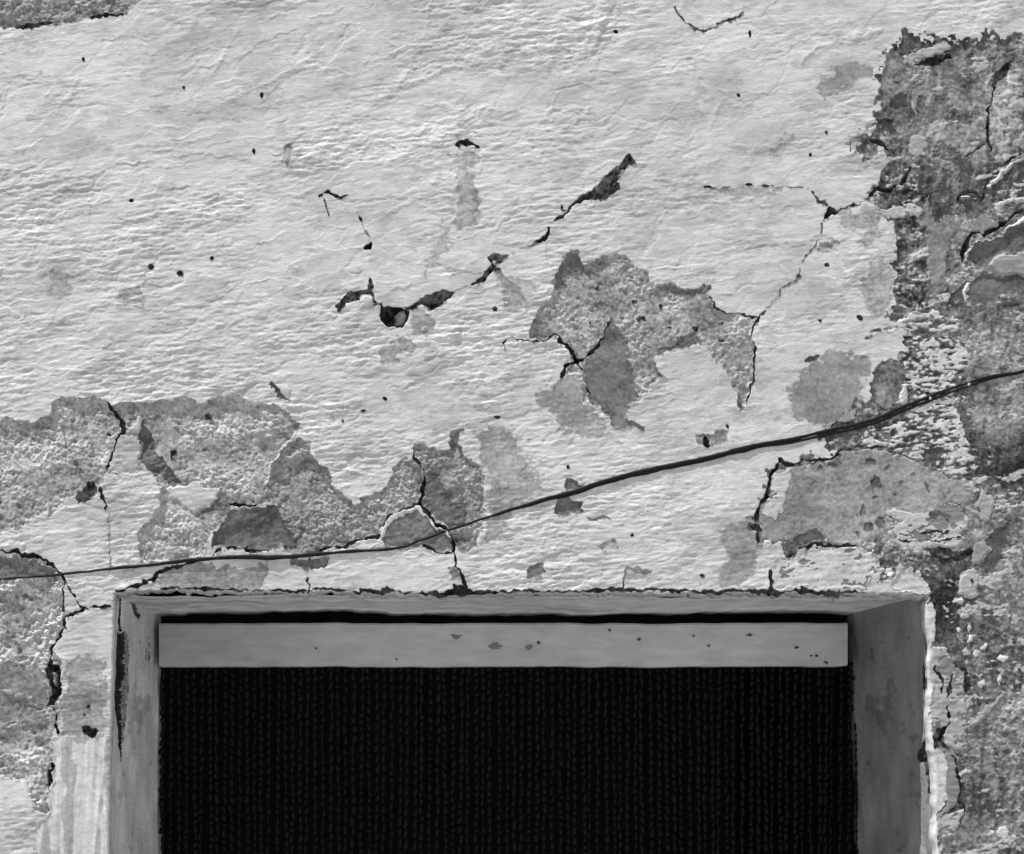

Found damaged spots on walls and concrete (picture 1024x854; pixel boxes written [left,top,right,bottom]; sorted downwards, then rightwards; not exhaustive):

crack [674,6,744,32]
spalling [0,381,546,591]
crack [318,190,372,250]
crack [466,154,637,287]
crack [502,317,612,402]
spalling [529,249,758,438]
crack [704,183,876,404]
spalling [717,27,1024,854]
crack [0,445,885,761]
crack [47,762,55,794]
spalling [0,552,110,854]